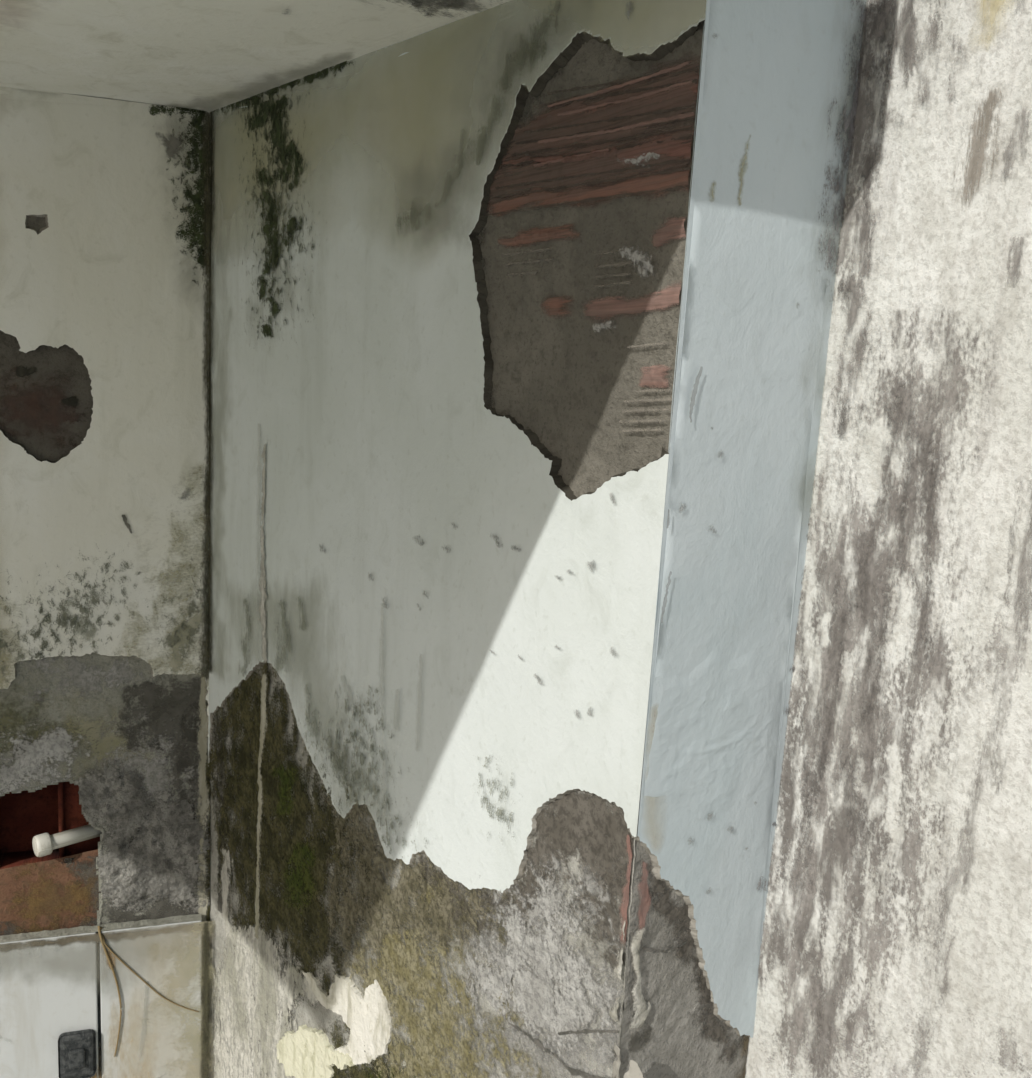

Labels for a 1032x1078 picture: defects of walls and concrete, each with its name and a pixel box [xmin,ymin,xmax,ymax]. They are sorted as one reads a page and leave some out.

flaking render [25,214,49,235]
flaking render [0,330,93,463]
leakage [149,0,490,349]
flaking render [469,20,717,503]
leakage [529,0,696,32]
leakage [757,0,1032,1078]
leakage [0,529,233,1078]
flaking render [0,652,750,1078]